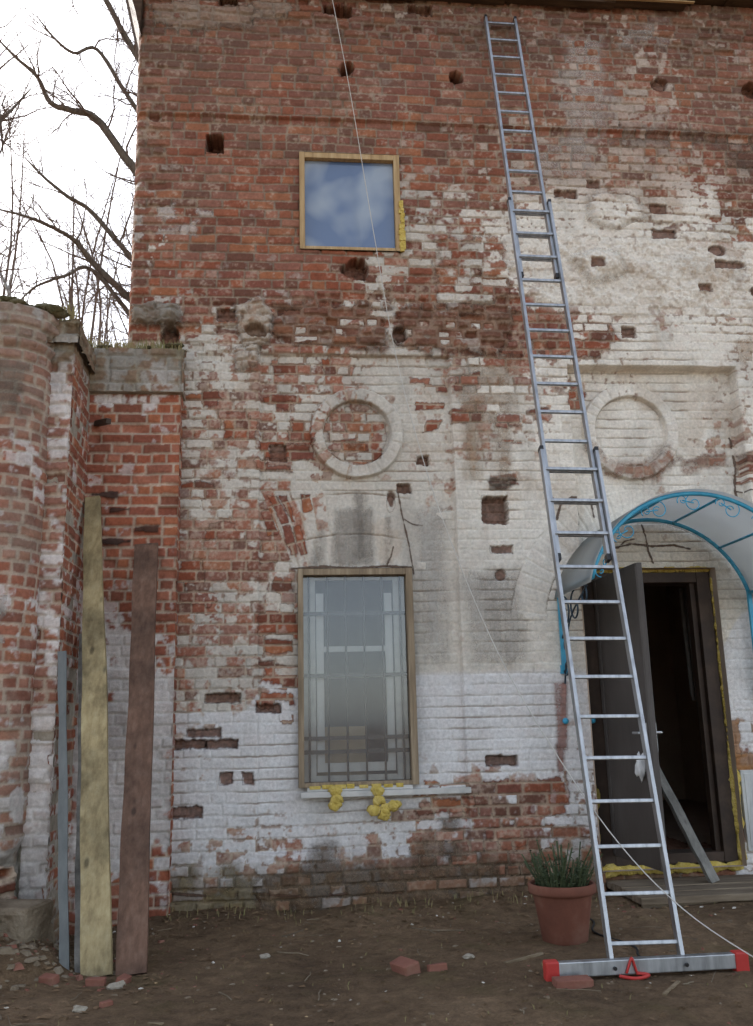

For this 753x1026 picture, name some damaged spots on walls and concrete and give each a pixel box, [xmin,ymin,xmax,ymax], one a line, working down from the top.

spalling [554,183,597,199]
spalling [649,205,666,214]
spalling [709,247,746,269]
spalling [217,308,236,322]
peeling [585,443,753,485]
peeling [180,477,218,501]
crack [556,496,595,520]
peeling [260,494,313,564]
crack [615,524,691,564]
peeling [256,576,298,724]
spalling [205,693,241,704]
spalling [173,806,203,820]